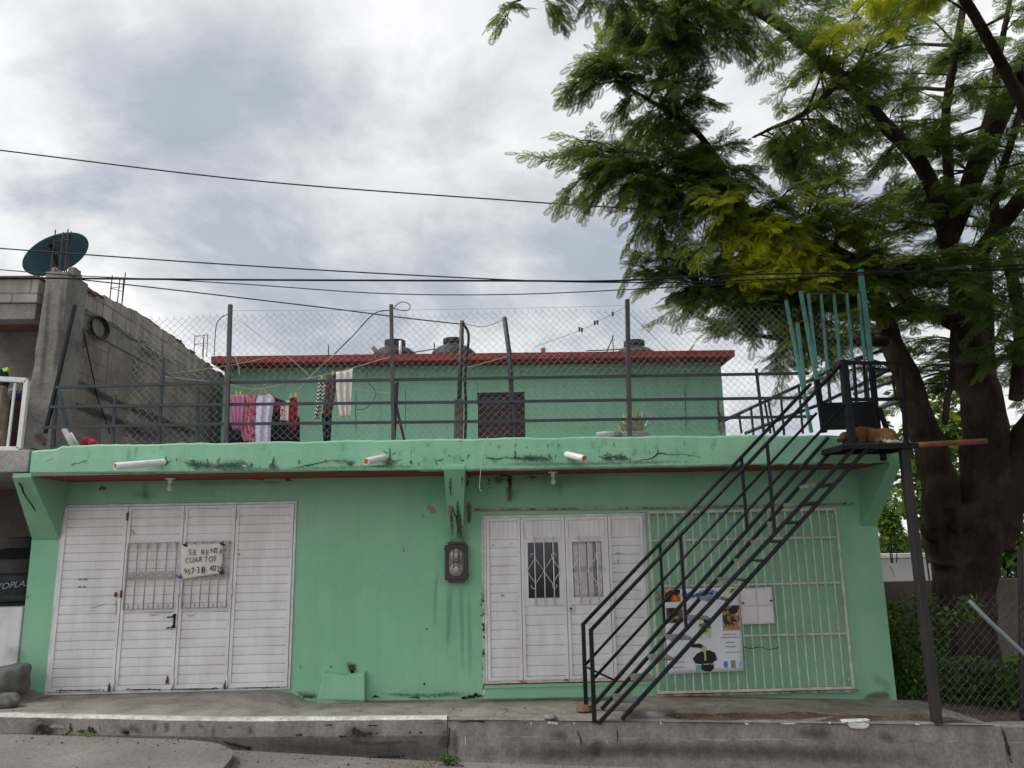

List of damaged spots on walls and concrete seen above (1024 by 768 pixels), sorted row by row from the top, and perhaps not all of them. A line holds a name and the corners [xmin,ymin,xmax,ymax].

water stain [219,449,419,470]
crack [637,449,701,462]
water stain [448,475,490,538]